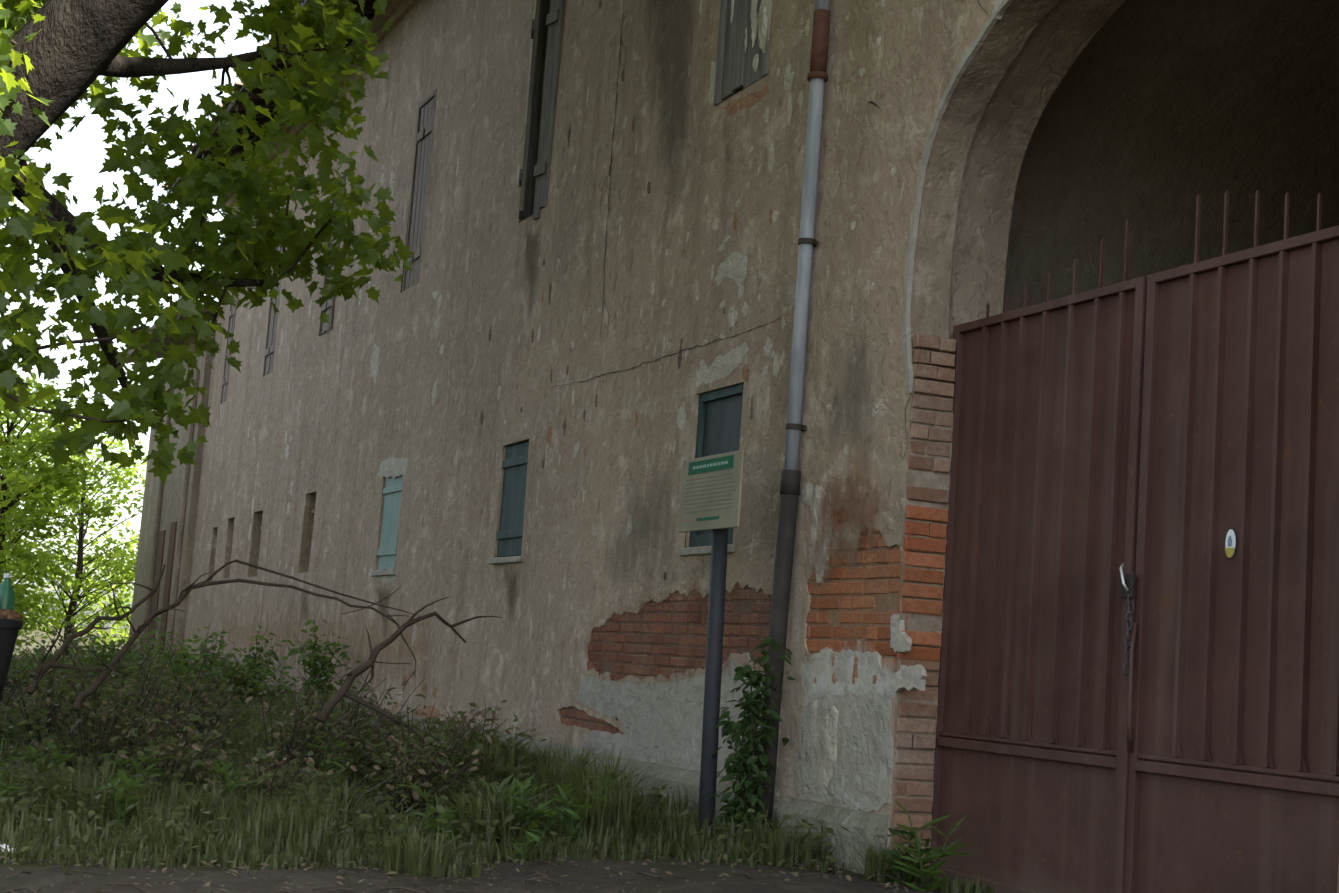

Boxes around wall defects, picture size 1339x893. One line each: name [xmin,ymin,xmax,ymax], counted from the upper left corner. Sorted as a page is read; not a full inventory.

crack [600,5,626,338]
crack [555,314,787,386]
flaking render [908,334,957,473]
flaking render [559,706,624,734]
flaking render [587,590,709,681]
flaking render [722,583,772,670]
flaking render [806,485,950,872]